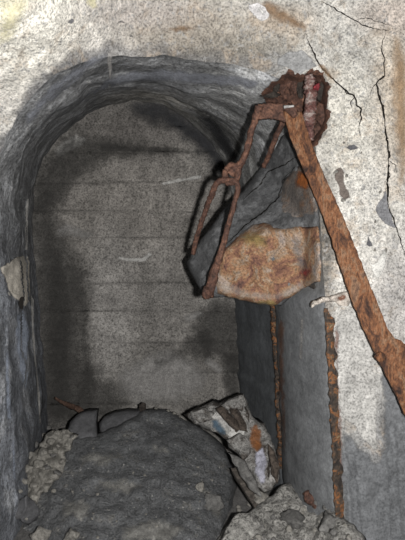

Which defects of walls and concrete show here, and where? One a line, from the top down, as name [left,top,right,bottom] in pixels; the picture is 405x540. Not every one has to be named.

spalling [260,68,331,147]
crack [306,34,362,134]
crack [319,1,405,256]
rust [394,49,405,156]
flaking render [1,255,30,309]
rust [216,223,321,306]